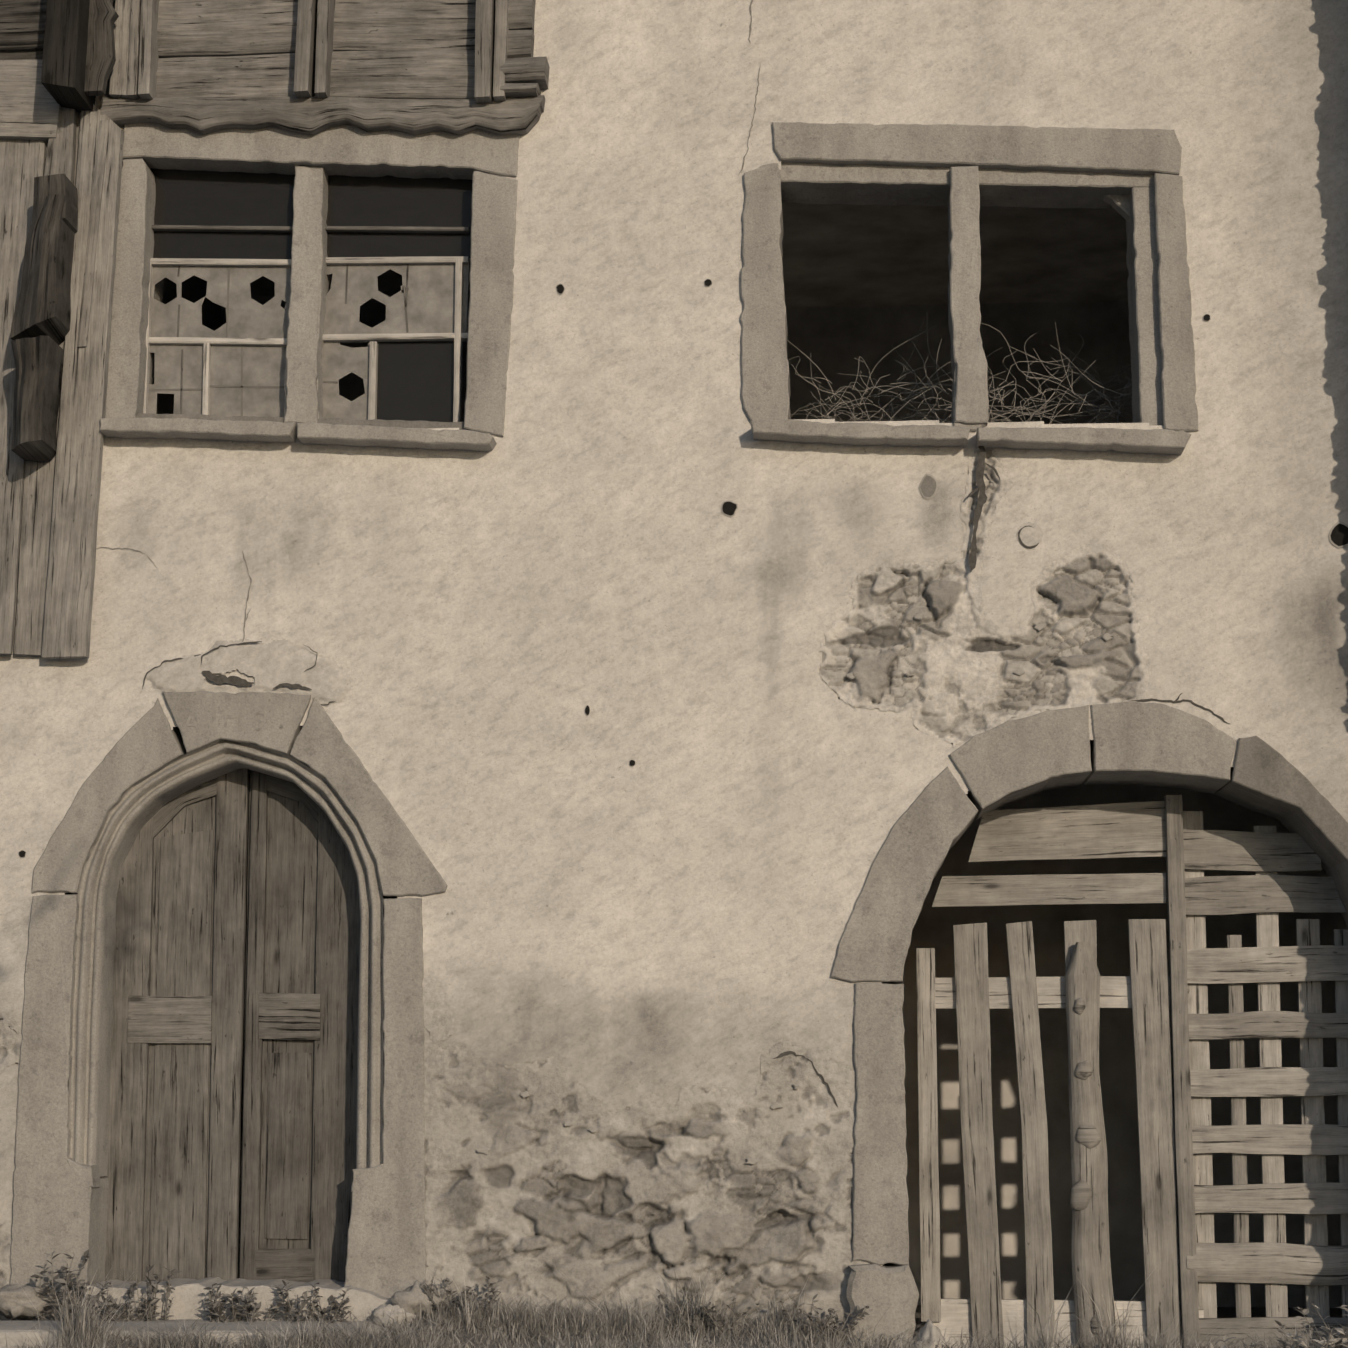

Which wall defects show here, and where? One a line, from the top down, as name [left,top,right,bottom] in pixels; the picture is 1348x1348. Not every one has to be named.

crack [738,0,760,176]
crack [242,551,252,642]
peeling [142,639,353,706]
spalling [817,442,1152,747]
spalling [0,1012,22,1073]
spalling [422,973,861,1345]